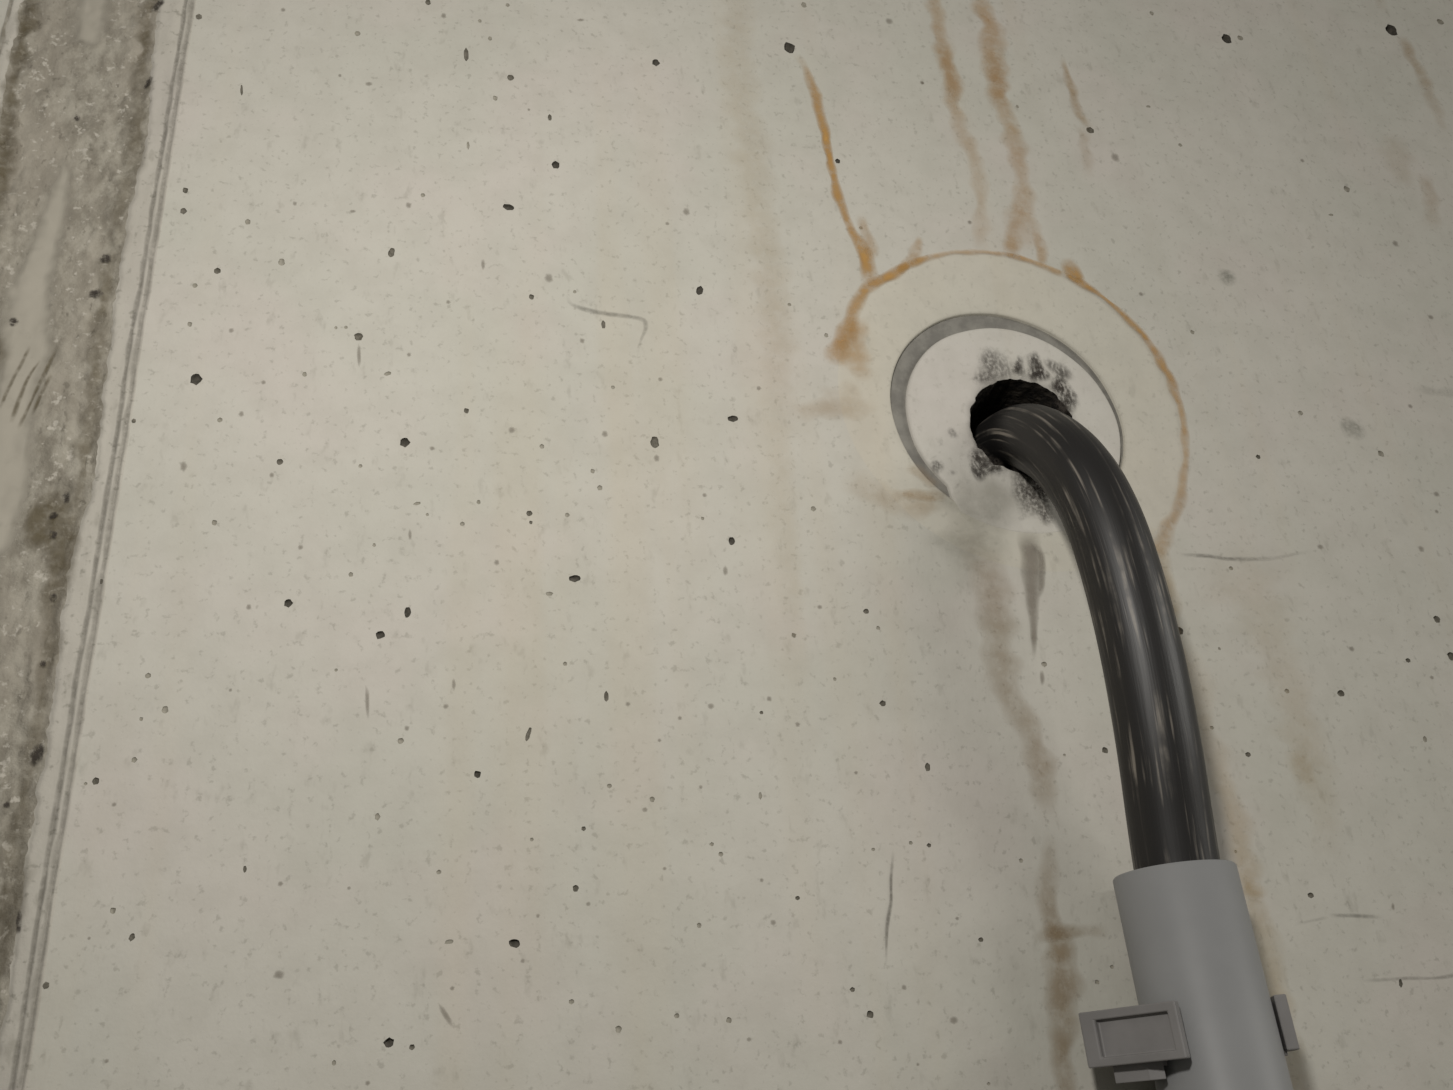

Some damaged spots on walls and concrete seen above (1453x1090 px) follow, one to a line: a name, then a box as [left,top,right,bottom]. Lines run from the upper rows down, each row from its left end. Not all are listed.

rust [813,88,925,346]
damp [1014,356,1075,412]
rust [1067,267,1180,403]